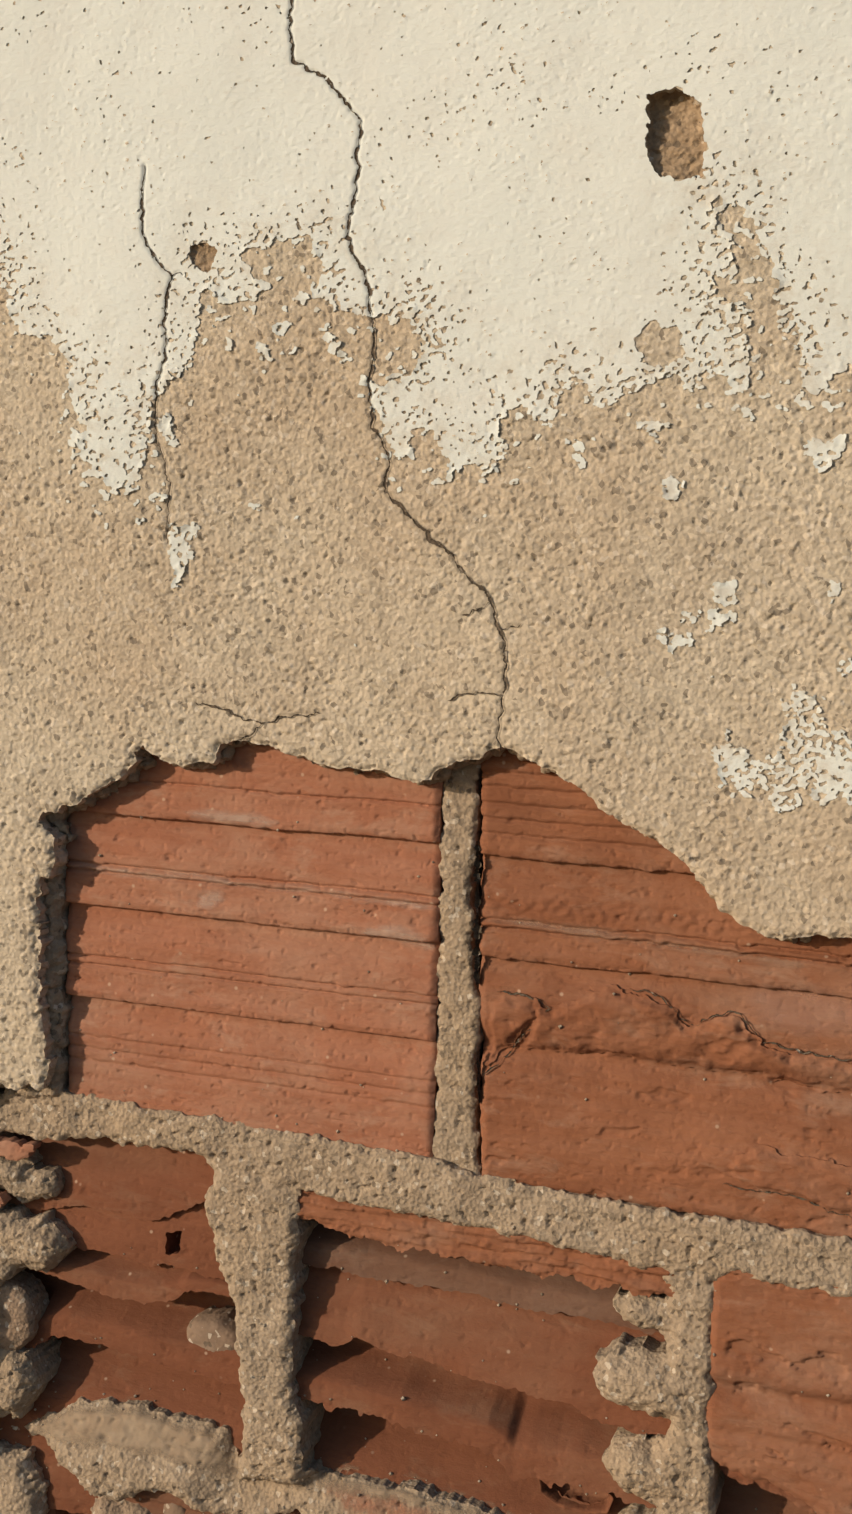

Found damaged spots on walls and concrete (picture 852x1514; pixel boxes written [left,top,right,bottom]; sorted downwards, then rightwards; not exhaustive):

crack [140,165,180,544]
crack [288,0,522,751]
peeling [0,90,852,588]
peeling [656,579,738,654]
peeling [827,580,841,604]
spalling [46,740,396,842]
crack [196,703,320,741]
spalling [413,748,561,785]
peeling [711,684,852,814]
crack [472,841,551,1104]
spalling [485,984,852,1094]
spalling [719,1465,817,1514]